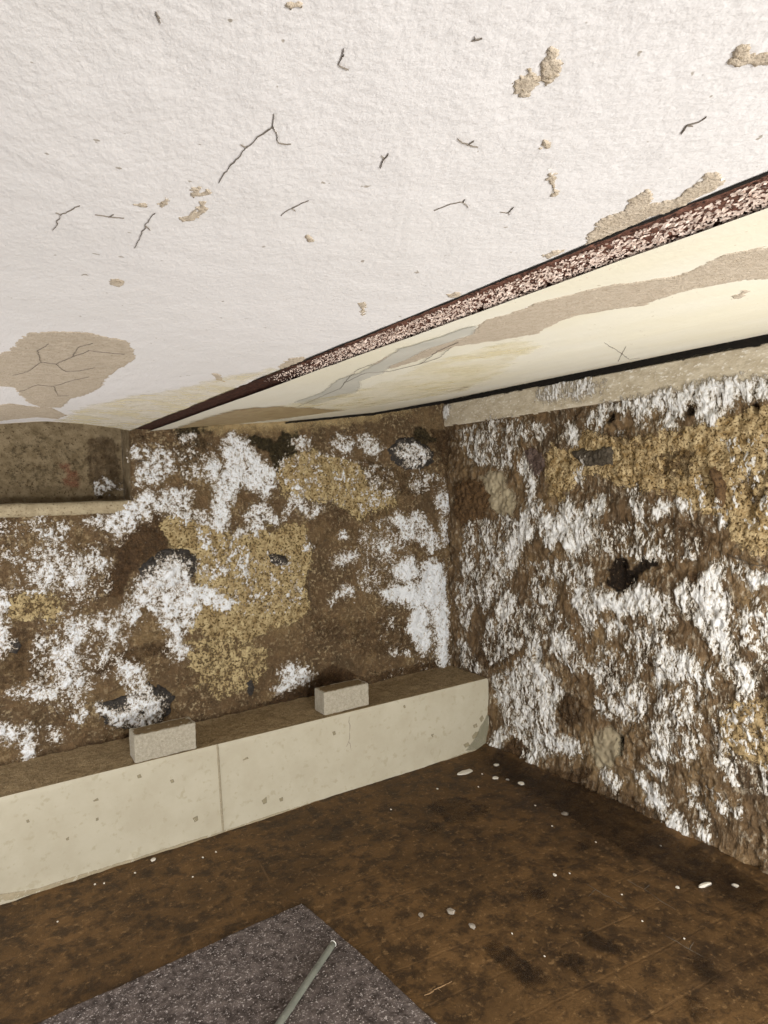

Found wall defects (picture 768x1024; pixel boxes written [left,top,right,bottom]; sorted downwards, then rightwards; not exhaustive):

peeling [512,46,564,98]
peeling [727,44,768,67]
crack [219,119,291,182]
crack [681,116,707,135]
crack [53,205,155,247]
peeling [580,172,726,248]
rust [137,175,768,430]
peeling [371,246,768,369]
peeling [0,331,136,421]
crack [12,343,125,392]
damp [0,327,768,893]